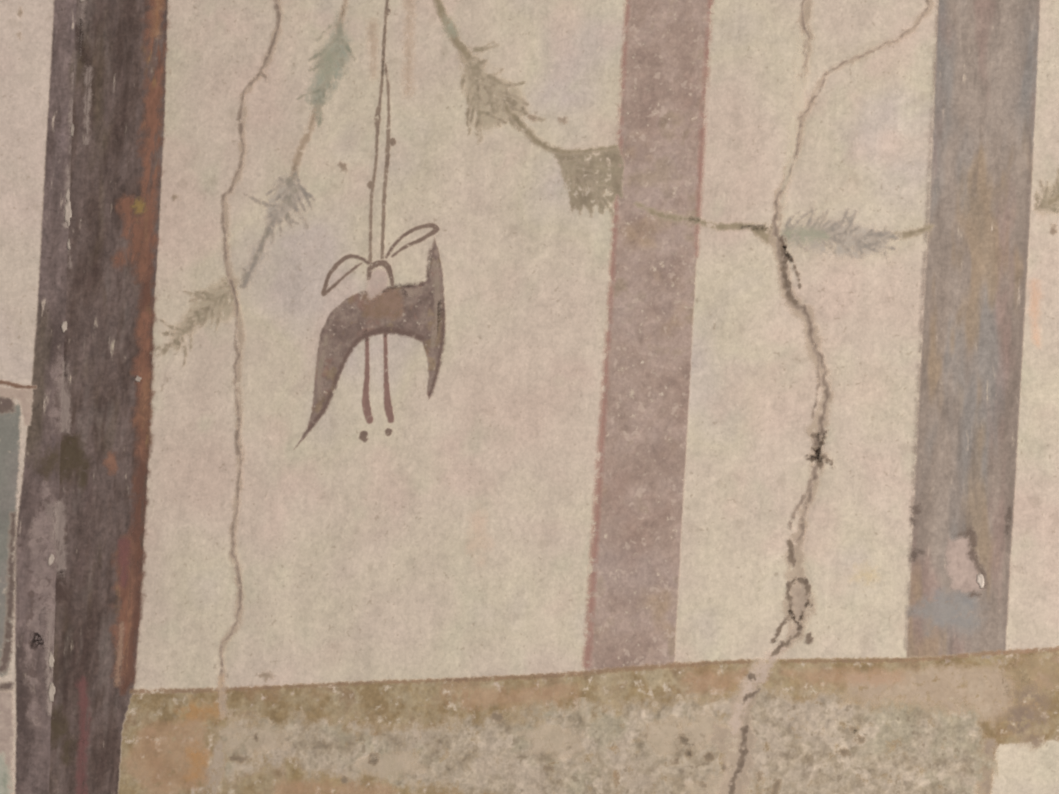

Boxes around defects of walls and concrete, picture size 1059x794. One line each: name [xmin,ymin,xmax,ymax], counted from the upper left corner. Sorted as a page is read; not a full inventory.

crack [218,0,281,717]
crack [712,0,934,794]
spalling [946,528,987,597]